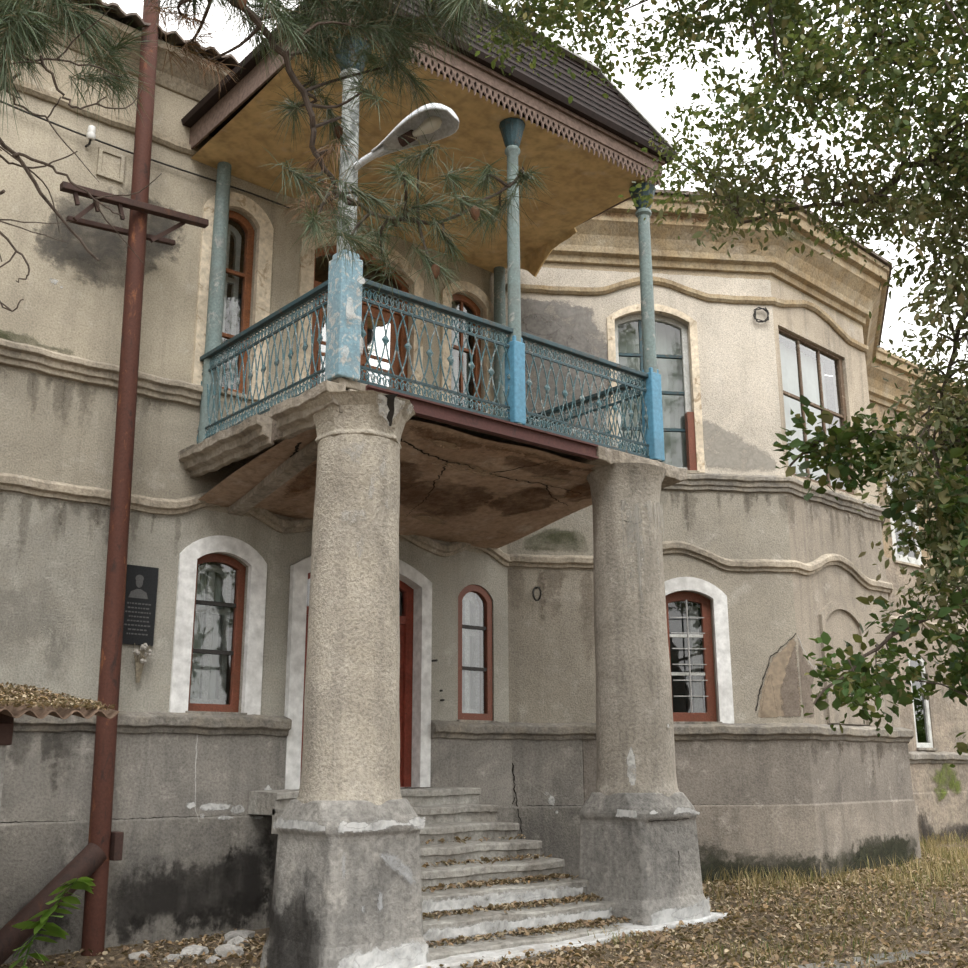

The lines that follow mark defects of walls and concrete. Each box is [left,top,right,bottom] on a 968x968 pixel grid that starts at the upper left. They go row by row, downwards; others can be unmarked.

crack [400,439,581,516]
flaking render [755,633,817,718]
crack [512,763,582,839]
crack [648,804,777,822]
water stain [699,814,968,884]
water stain [113,834,316,968]